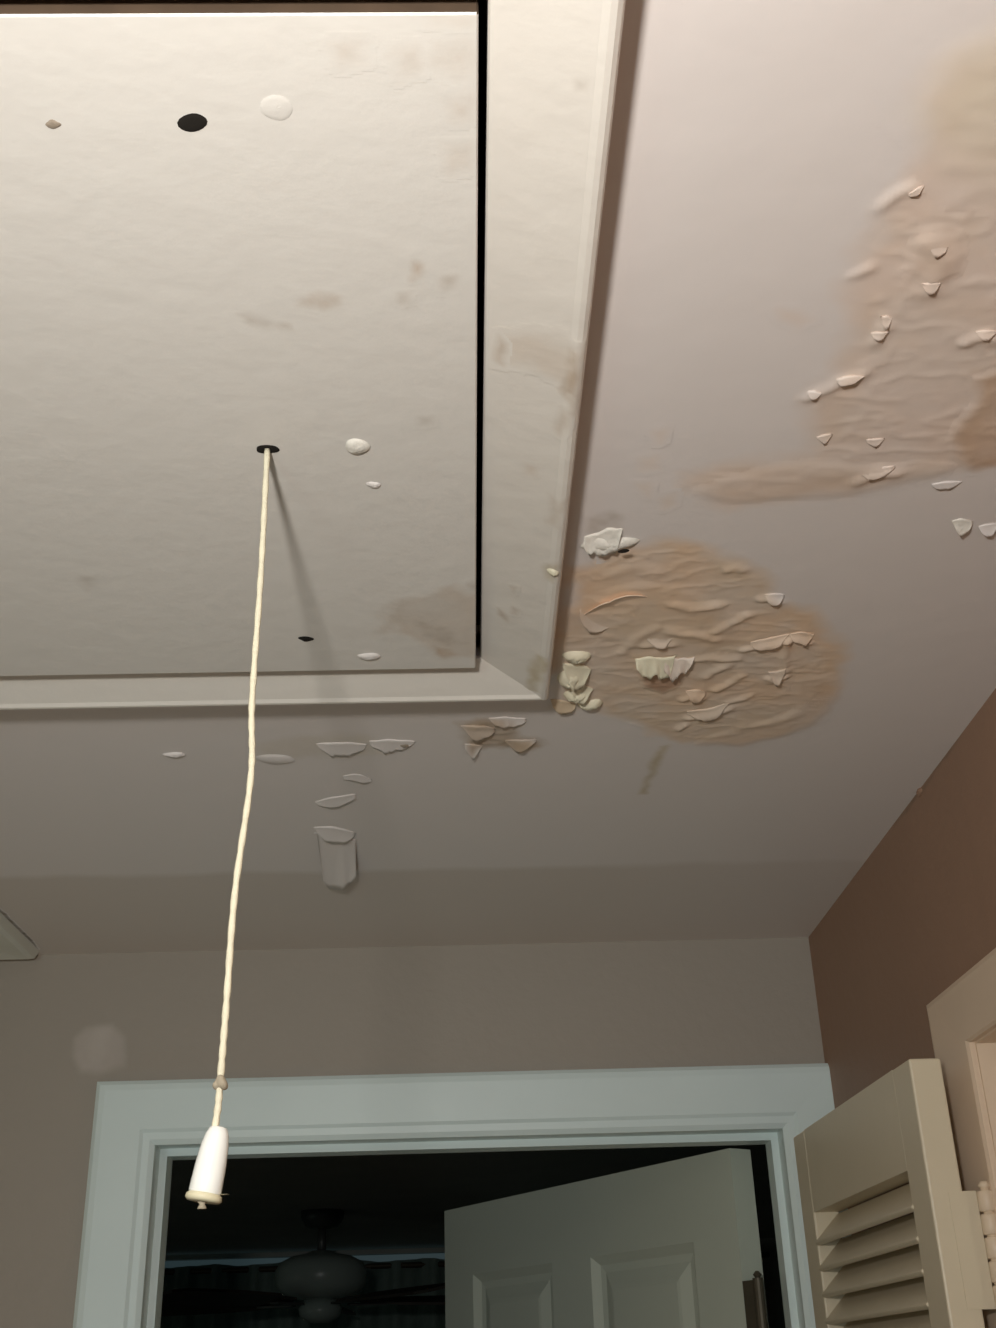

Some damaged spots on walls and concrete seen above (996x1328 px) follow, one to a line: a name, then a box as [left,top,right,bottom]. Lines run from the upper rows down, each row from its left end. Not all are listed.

water stain [666,0,996,519]
peeling [952,518,996,537]
water stain [522,528,861,796]
peeling [488,716,526,729]
peeling [316,739,416,758]
peeling [315,774,372,809]
peeling [313,826,356,890]